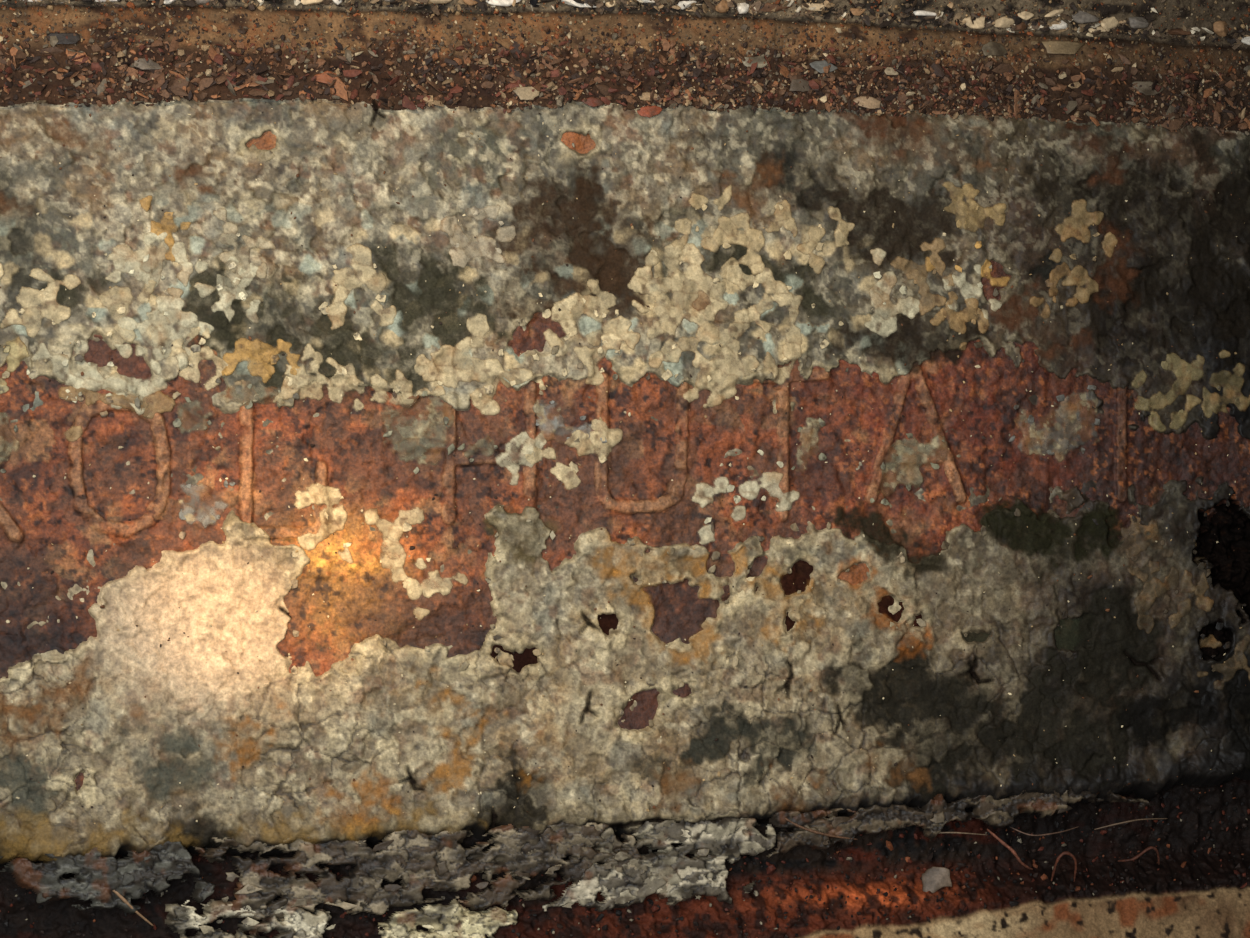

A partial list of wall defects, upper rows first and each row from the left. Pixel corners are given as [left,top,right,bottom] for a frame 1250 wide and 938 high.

peeling [0,196,623,490]
peeling [538,186,855,408]
crack [403,767,425,790]
peeling [364,507,468,621]
peeling [0,781,1157,938]
crack [580,694,596,723]
crack [581,613,598,632]
rust [0,261,1250,679]
crack [587,817,769,828]
spalling [633,417,827,647]
crack [780,661,793,697]
rust [501,784,1250,938]